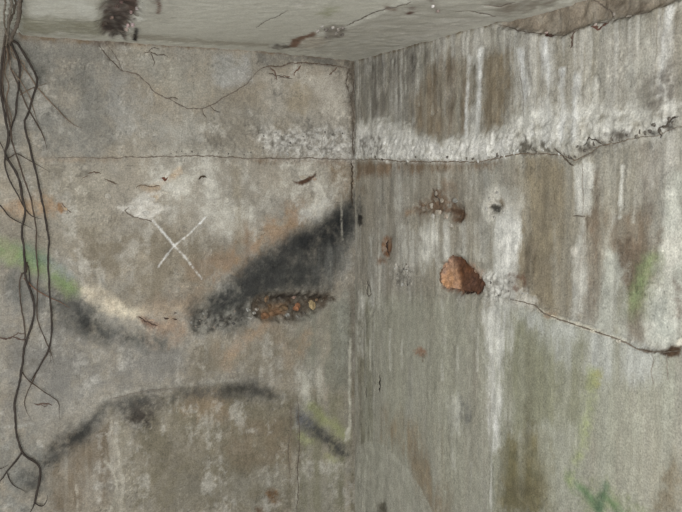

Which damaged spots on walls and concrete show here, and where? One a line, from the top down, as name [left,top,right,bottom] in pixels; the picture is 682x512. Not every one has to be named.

crack [349,2,410,25]
spalling [496,0,682,48]
crack [99,45,257,117]
crack [35,62,682,205]
spalling [402,173,470,228]
rust [375,234,394,267]
damp [136,1,682,512]
spalling [185,288,338,340]